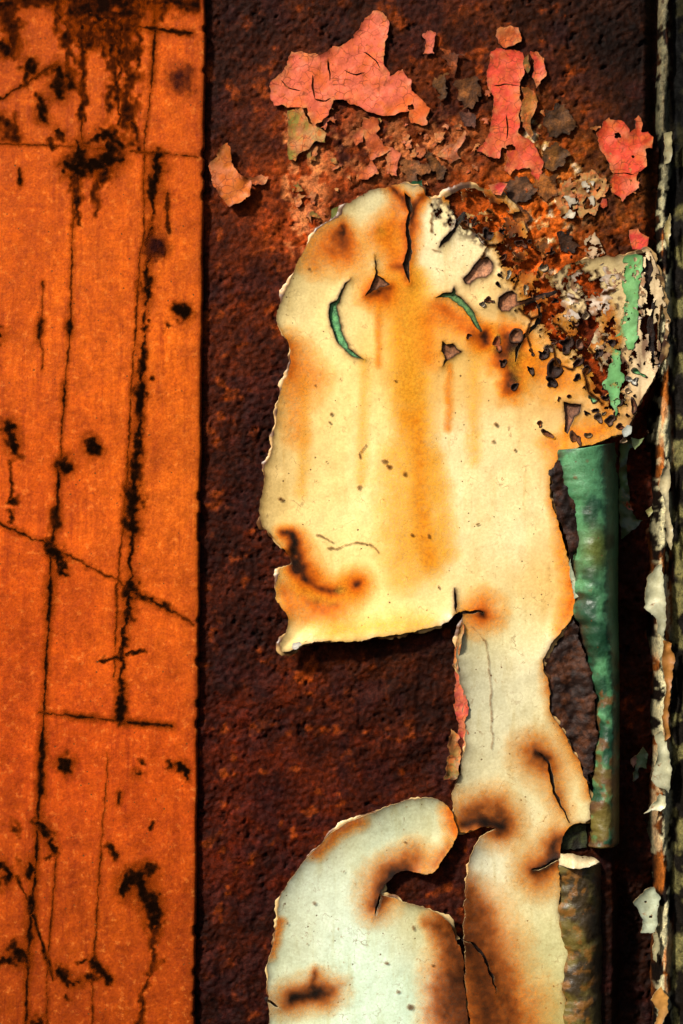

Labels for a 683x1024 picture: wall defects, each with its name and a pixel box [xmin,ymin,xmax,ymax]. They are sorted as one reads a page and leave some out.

rust [56,121,171,234]
rust [301,184,648,582]
rust [275,525,397,630]
peeling [256,10,675,1024]
rust [464,591,503,631]
rust [549,500,575,635]
rust [515,664,590,896]
crack [538,752,570,823]
rust [360,789,523,922]
rust [116,861,166,1024]
rust [271,966,343,1016]
rust [421,877,540,1024]